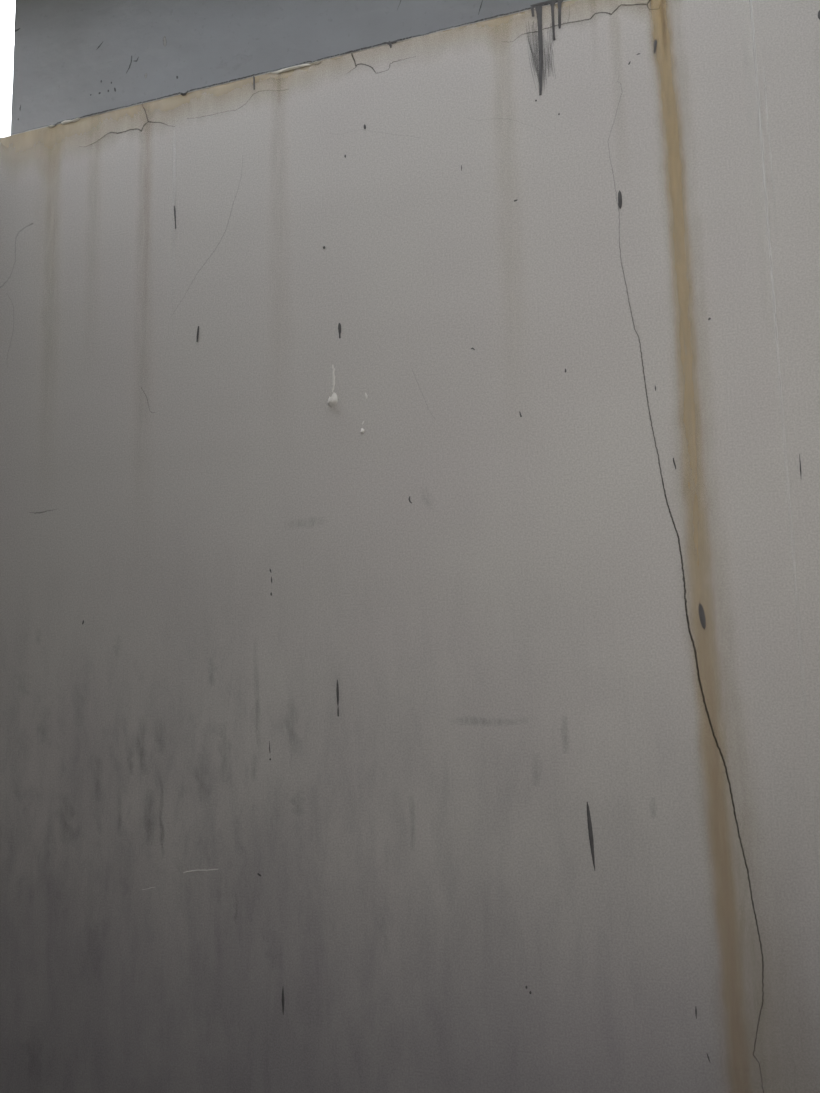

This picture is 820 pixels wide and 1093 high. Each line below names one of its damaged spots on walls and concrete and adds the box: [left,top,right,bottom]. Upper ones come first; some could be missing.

crack [54,0,650,140]
rust [651,0,695,462]
crack [632,319,764,1052]